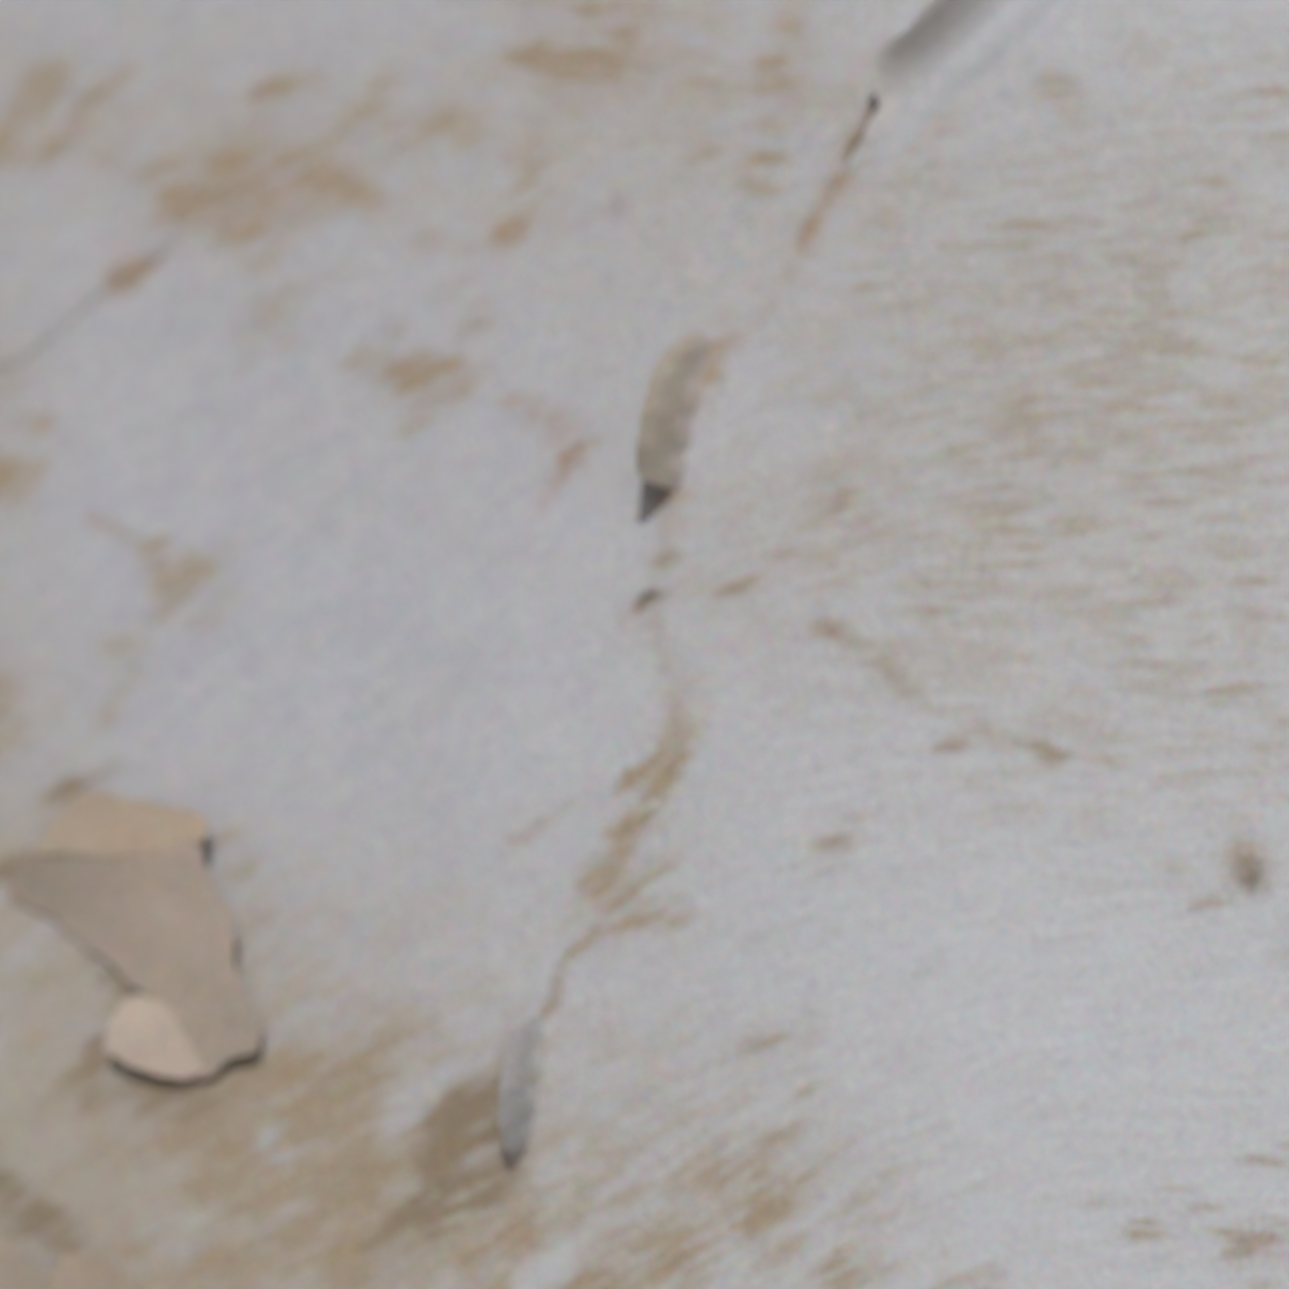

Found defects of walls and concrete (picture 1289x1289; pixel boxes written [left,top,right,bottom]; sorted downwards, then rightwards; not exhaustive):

peeling [847,0,1059,166]
crack [15,241,172,360]
peeling [0,354,61,529]
peeling [329,336,617,520]
peeling [626,305,746,522]
peeling [68,502,255,742]
flaking render [554,660,723,952]
peeling [0,754,591,1289]
peeling [541,1086,1017,1289]